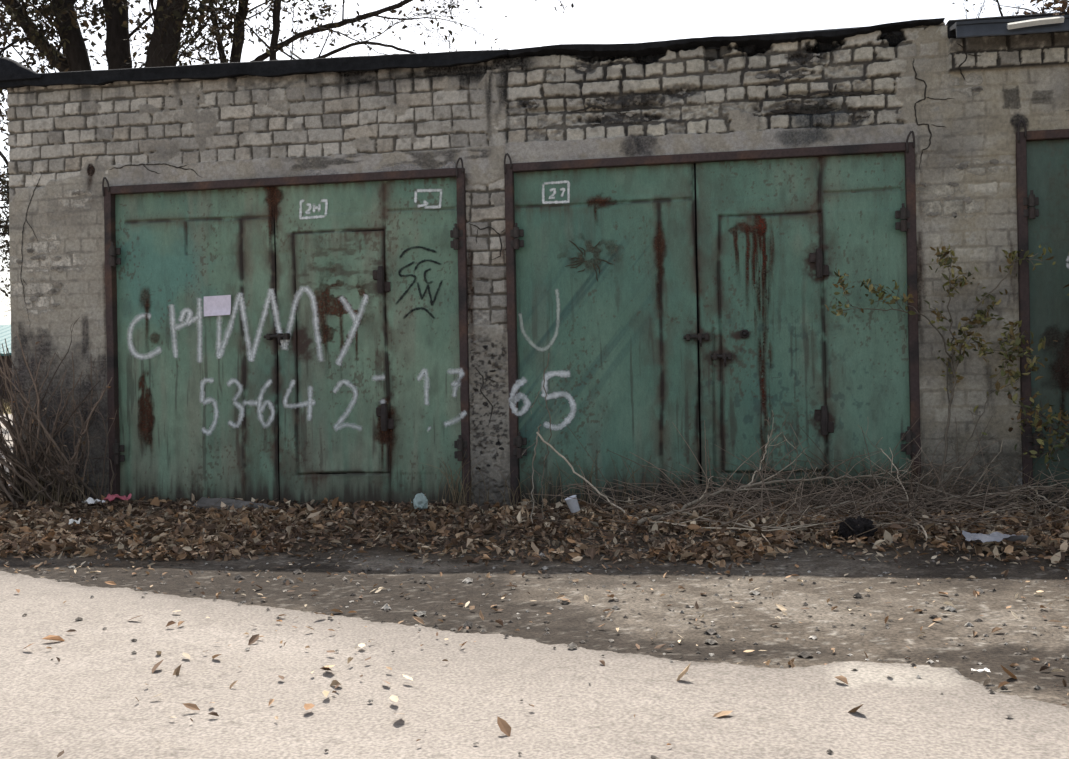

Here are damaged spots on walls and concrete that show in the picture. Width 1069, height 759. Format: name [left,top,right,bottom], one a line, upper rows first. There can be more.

damp [487,69,508,114]
damp [781,99,845,145]
crack [913,43,980,168]
rust [654,227,665,291]
rust [729,216,774,462]
rust [138,373,155,444]